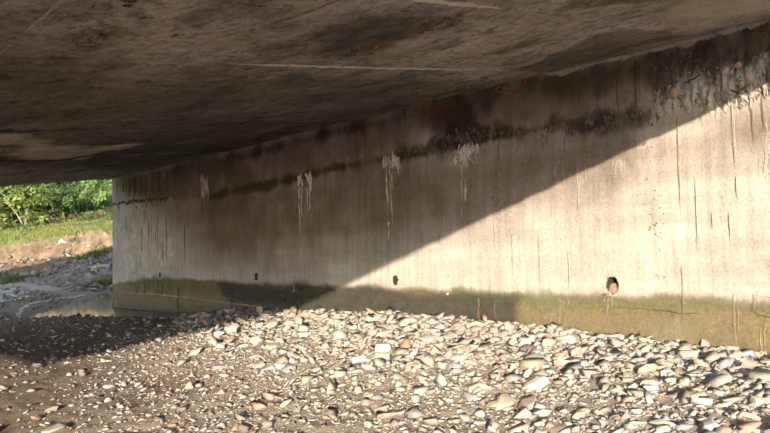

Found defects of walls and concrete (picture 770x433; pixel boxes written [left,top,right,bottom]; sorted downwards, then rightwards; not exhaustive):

leakage [665,0,770,24]
crack [112,197,167,209]
leakage [0,27,770,258]
leakage [112,212,770,354]